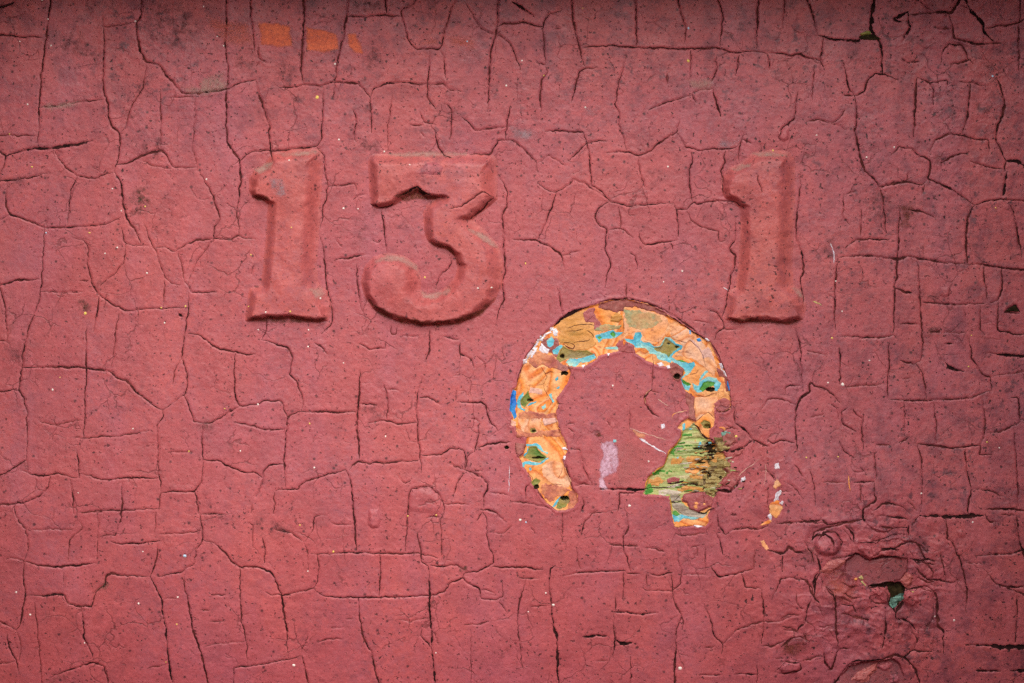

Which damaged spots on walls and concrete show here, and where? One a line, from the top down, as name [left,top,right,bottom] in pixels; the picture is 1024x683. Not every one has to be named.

crack [466,0,860,116]
crack [447,104,750,341]
crack [0,0,563,683]
peeling [504,298,746,528]
crack [566,0,1024,683]
peeling [819,520,919,609]